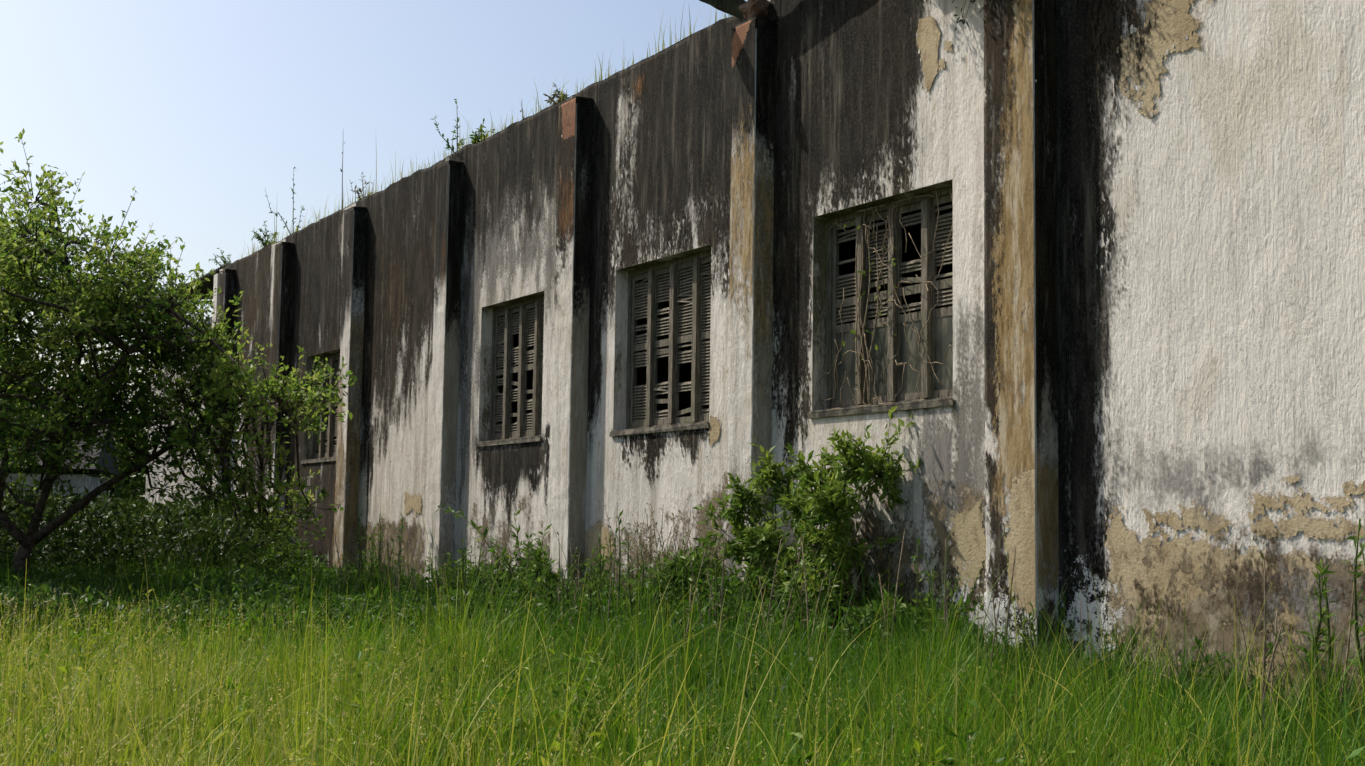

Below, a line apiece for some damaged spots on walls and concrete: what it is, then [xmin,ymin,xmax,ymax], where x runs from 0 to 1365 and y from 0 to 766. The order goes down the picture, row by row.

peeling [916,15,953,98]
peeling [1116,0,1211,119]
water stain [214,0,927,594]
water stain [770,0,1365,694]
peeling [1058,475,1365,683]